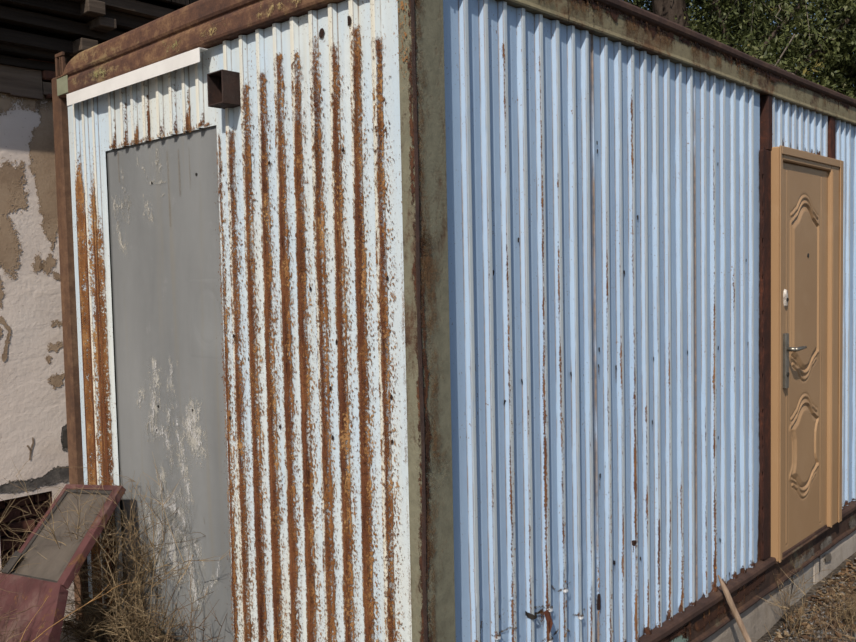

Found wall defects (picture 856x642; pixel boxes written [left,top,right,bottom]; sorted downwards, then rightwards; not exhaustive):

peeling [0,93,60,309]
corrosion [109,92,210,148]
corrosion [584,0,856,111]
peeling [46,340,63,364]
peeling [47,372,65,390]
corrosion [75,152,114,485]
corrosion [213,0,444,642]
corrosion [504,245,512,404]
corrosion [509,446,517,642]
corrosion [529,175,550,640]
corrosion [590,333,765,642]
corrosion [705,285,719,480]